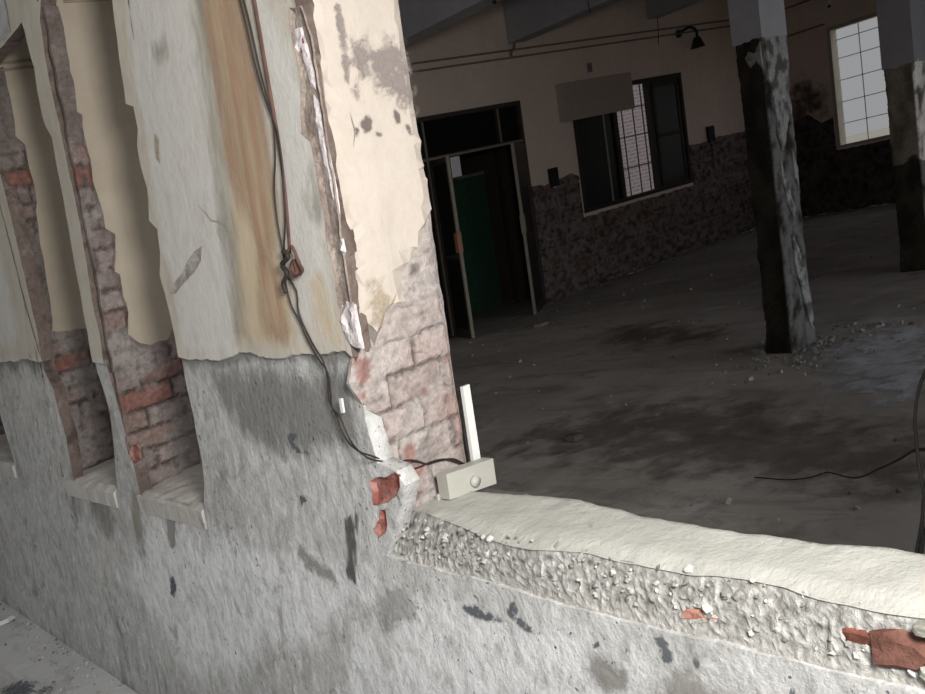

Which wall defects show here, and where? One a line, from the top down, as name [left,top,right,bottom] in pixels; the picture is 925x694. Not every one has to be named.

flaking render [0,67,115,470]
flaking render [37,0,202,487]
corrosion [203,0,288,340]
flaking render [289,3,466,508]
peeling [791,235,814,328]
flaking render [745,35,896,218]
flaking render [369,472,401,537]
peeling [655,637,673,663]